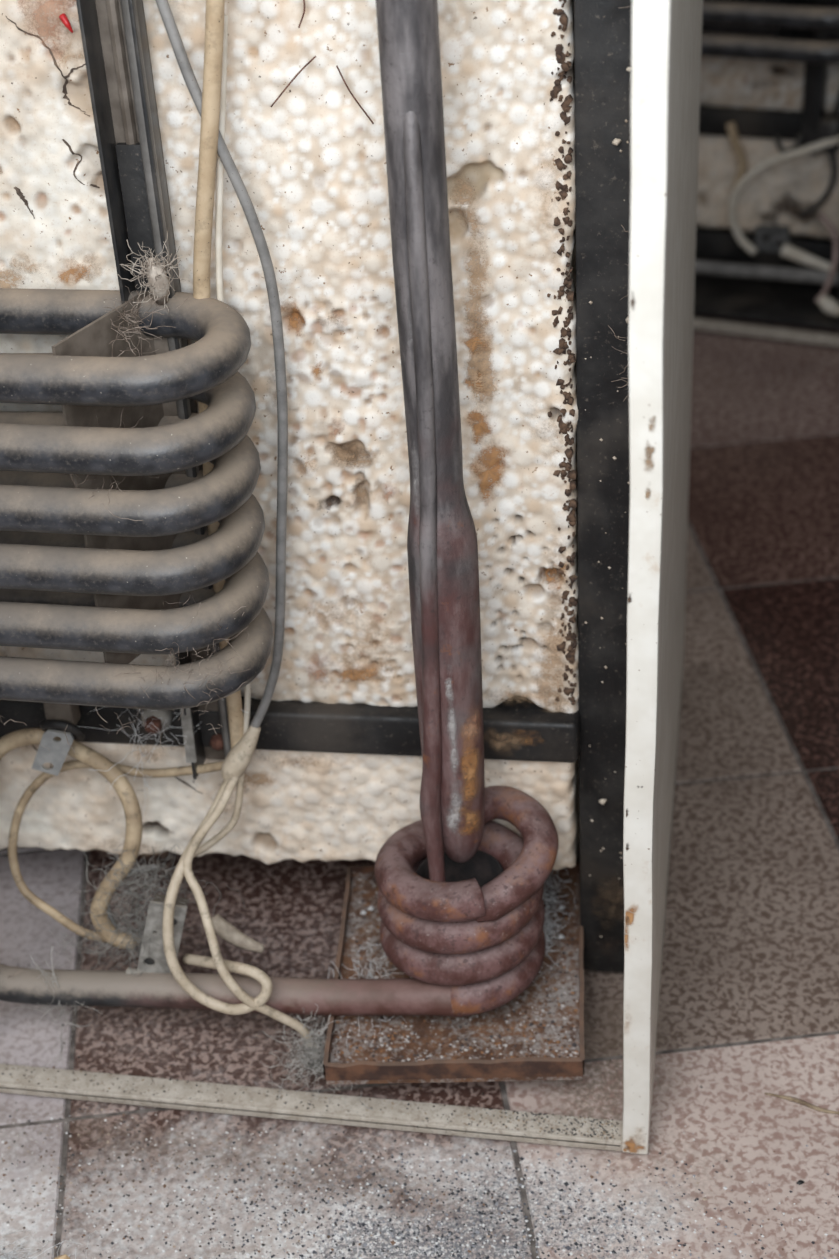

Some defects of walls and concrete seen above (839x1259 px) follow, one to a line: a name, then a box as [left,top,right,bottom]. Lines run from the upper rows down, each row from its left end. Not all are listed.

rust [464,251,505,500]
rust [623,1136,644,1153]